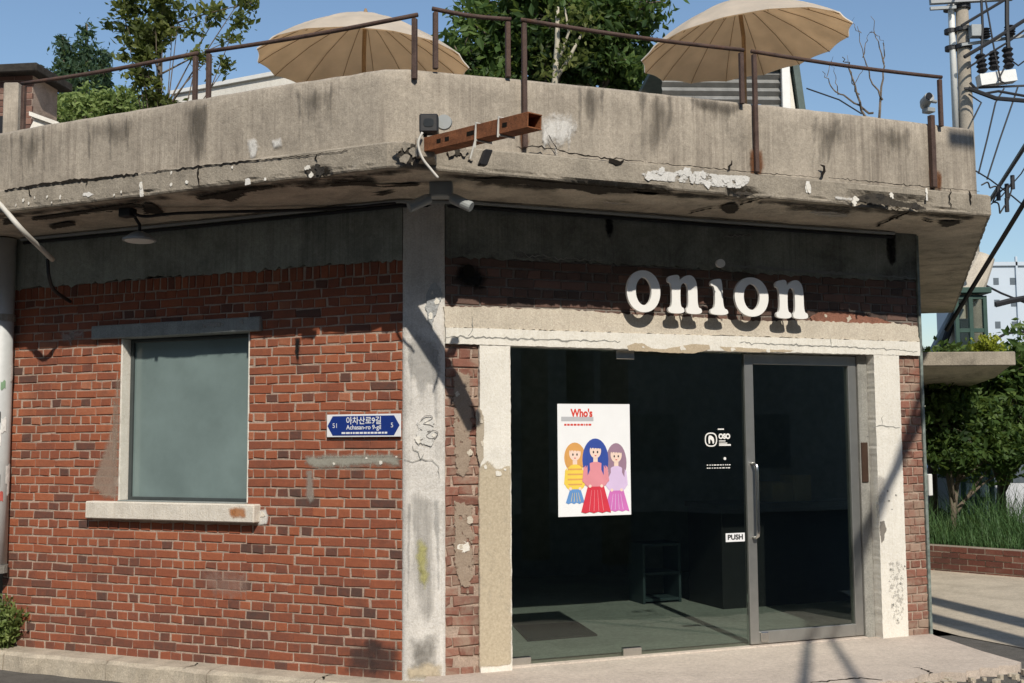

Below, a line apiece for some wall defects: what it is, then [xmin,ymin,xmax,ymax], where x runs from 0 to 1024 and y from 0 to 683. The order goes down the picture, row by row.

leakage [193,109,204,142]
crack [4,150,348,196]
peeling [474,167,750,203]
crack [518,136,978,207]
rust [751,150,763,174]
spalling [851,193,962,227]
rust [230,508,245,517]
peeling [452,371,511,667]